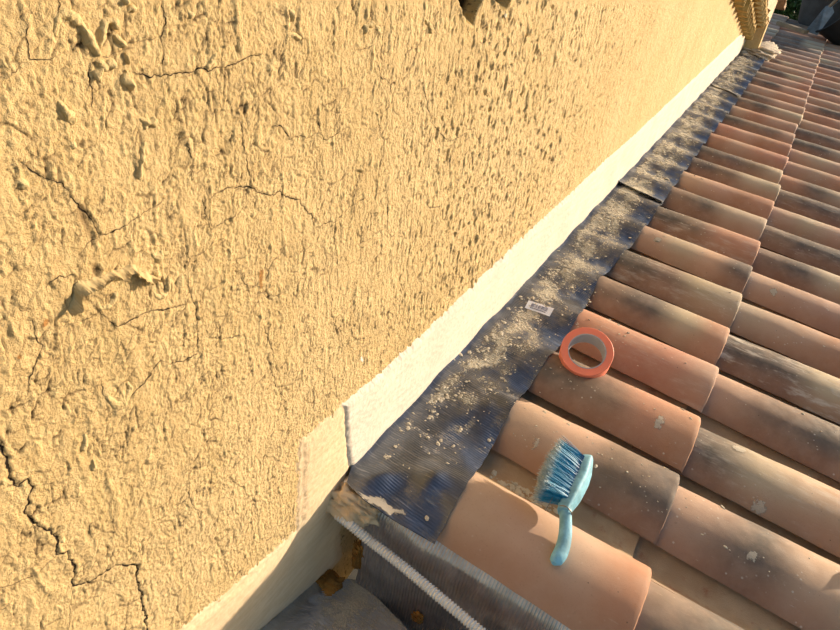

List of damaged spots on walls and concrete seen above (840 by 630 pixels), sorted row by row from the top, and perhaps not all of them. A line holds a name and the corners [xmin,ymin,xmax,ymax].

crack [1,10,54,77]
crack [88,4,262,106]
crack [27,167,164,252]
peeling [67,264,162,317]
crack [76,106,366,415]
crack [19,308,50,392]
crack [0,445,166,630]